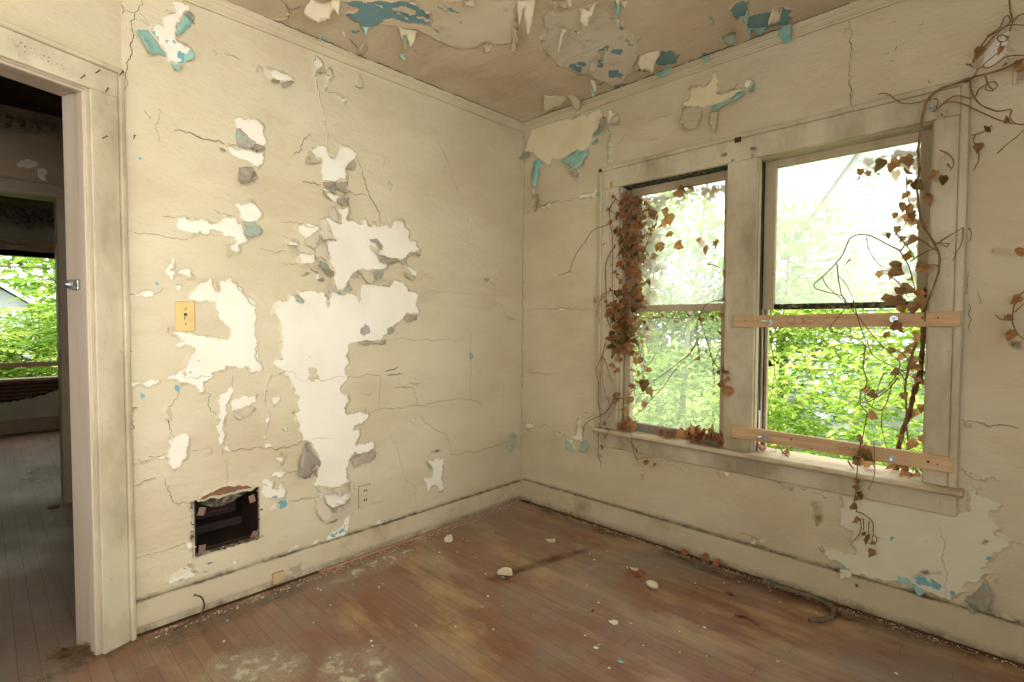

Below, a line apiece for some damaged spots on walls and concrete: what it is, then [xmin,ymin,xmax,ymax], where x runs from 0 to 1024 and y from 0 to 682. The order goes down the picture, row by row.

peeling [137,0,195,70]
peeling [722,0,794,46]
peeling [304,0,756,213]
peeling [173,116,269,184]
crack [128,231,218,242]
crack [346,3,854,456]
peeling [129,142,430,585]
crack [133,477,189,506]
crack [206,441,305,477]
peeling [422,457,444,494]
crack [135,540,213,564]
peeling [818,483,1021,622]